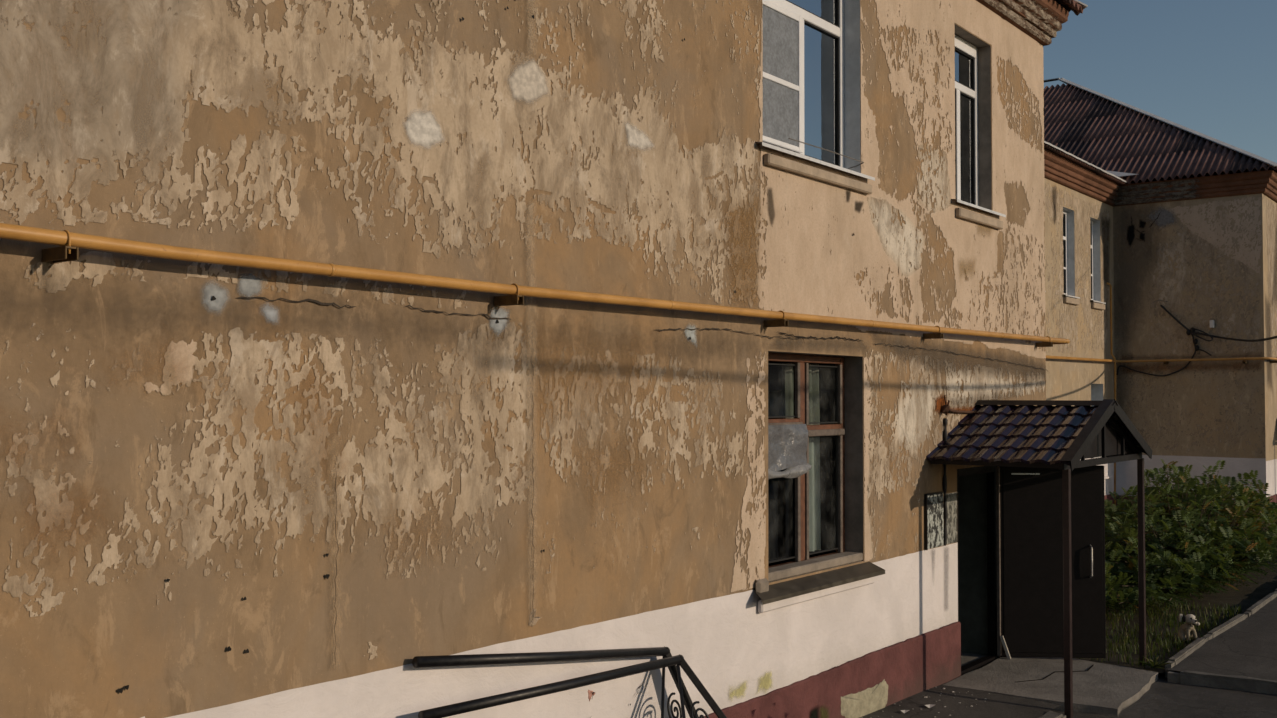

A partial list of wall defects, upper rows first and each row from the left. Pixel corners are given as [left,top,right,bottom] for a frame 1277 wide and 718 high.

crack [238,296,356,308]
peeling [0,0,1110,562]
crack [656,328,1046,370]
peeling [0,322,767,617]
spalling [841,679,888,718]